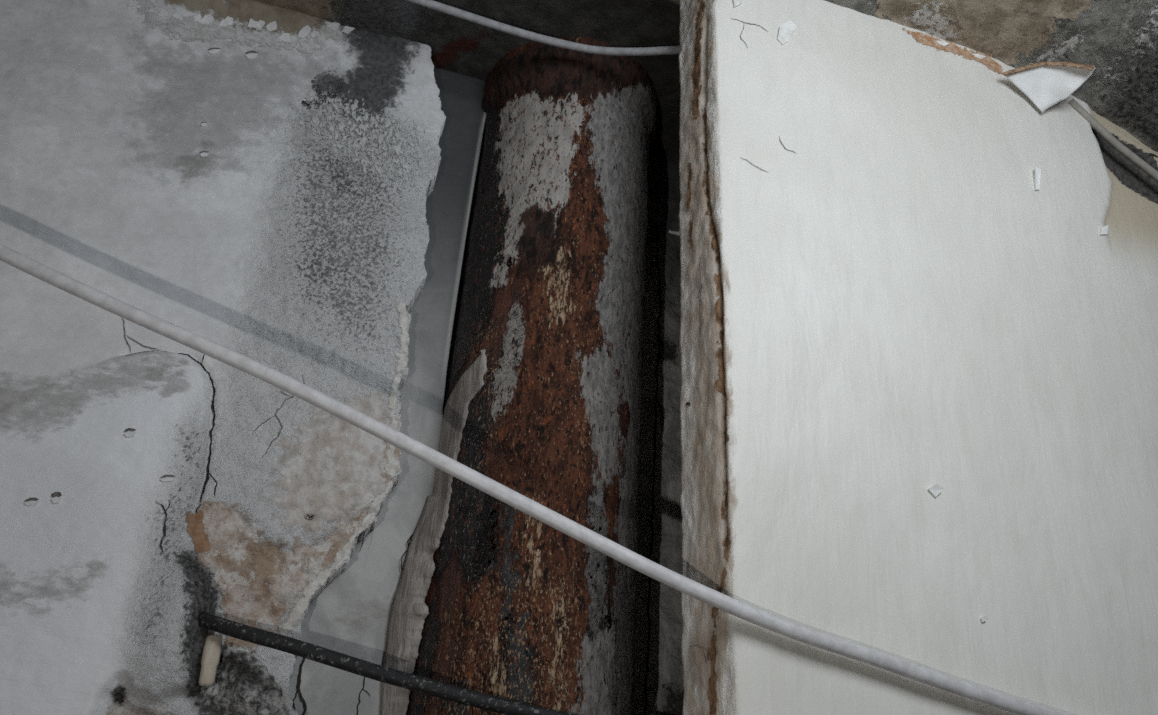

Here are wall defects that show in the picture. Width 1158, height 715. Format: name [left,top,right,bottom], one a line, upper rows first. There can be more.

flaking render [874,0,1096,113]
water stain [1029,34,1084,64]
water stain [1096,1,1158,144]
crack [122,318,218,552]
crack [252,378,305,459]
flaking render [186,406,401,637]
water stain [165,0,438,369]
flaking render [345,301,410,431]
rust [446,497,617,715]
rust [484,44,657,540]
rust [688,598,727,715]
rust [683,0,737,596]